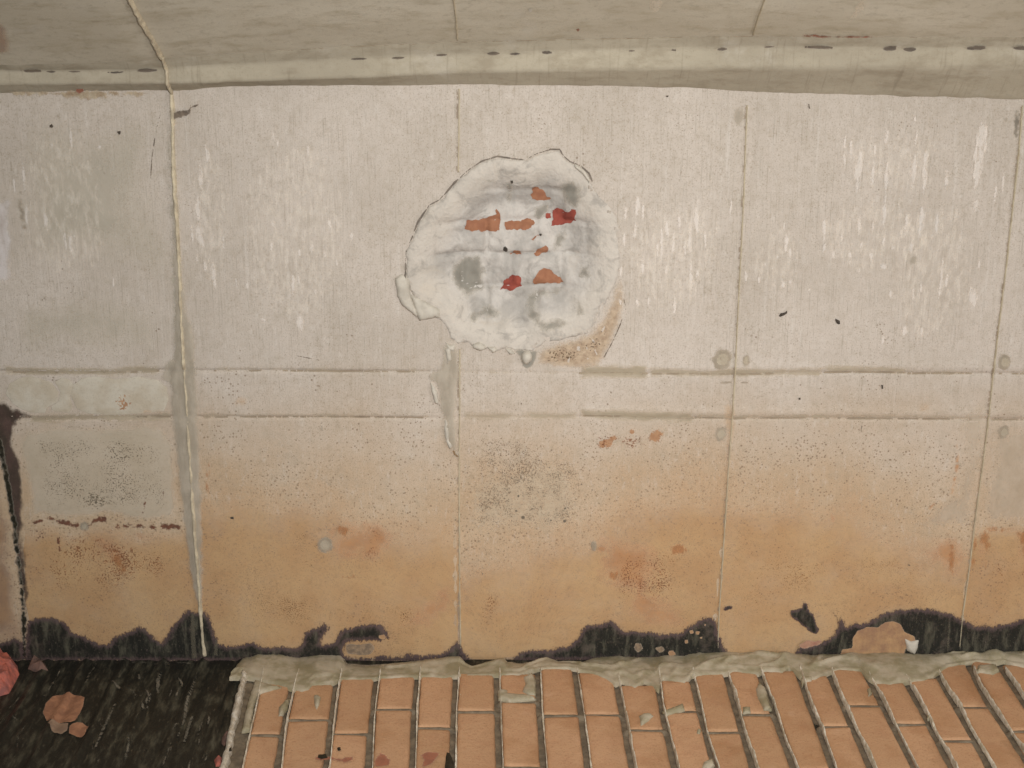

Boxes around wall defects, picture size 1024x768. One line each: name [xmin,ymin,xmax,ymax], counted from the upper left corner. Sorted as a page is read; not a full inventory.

spalling [395,149,622,368]
leakage [822,131,889,271]
leakage [973,127,987,187]
corrosion [598,429,664,448]
leakage [530,411,954,421]
leakage [0,404,180,657]
corrosion [23,507,1024,659]